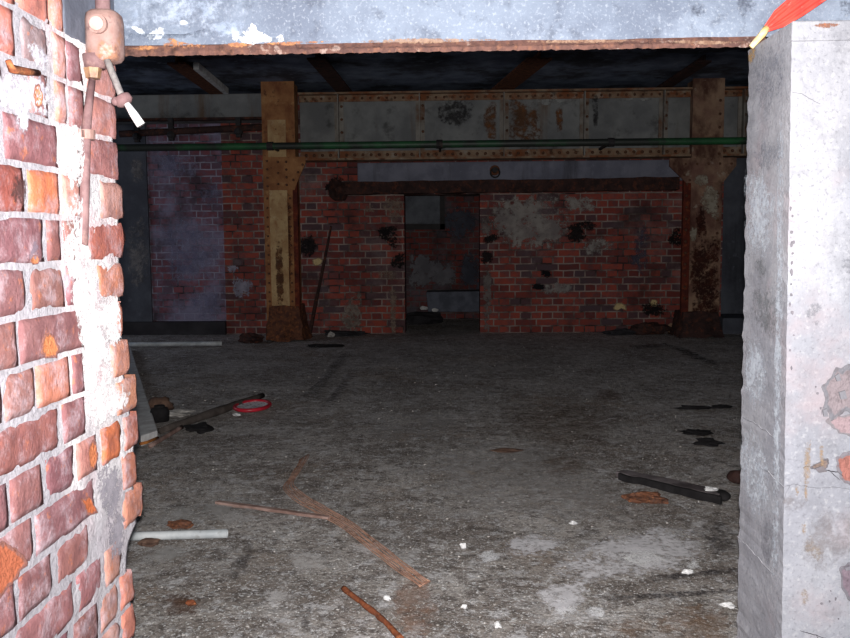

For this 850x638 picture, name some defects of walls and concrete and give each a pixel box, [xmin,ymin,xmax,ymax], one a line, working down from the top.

peeling [132,26,164,40]
corrosion [135,38,204,50]
leakage [438,100,471,126]
corrosion [509,100,540,140]
leakage [481,194,594,248]
corrosion [276,202,291,304]
corrosion [690,206,720,313]
spalling [815,364,850,436]
spalling [810,451,850,485]